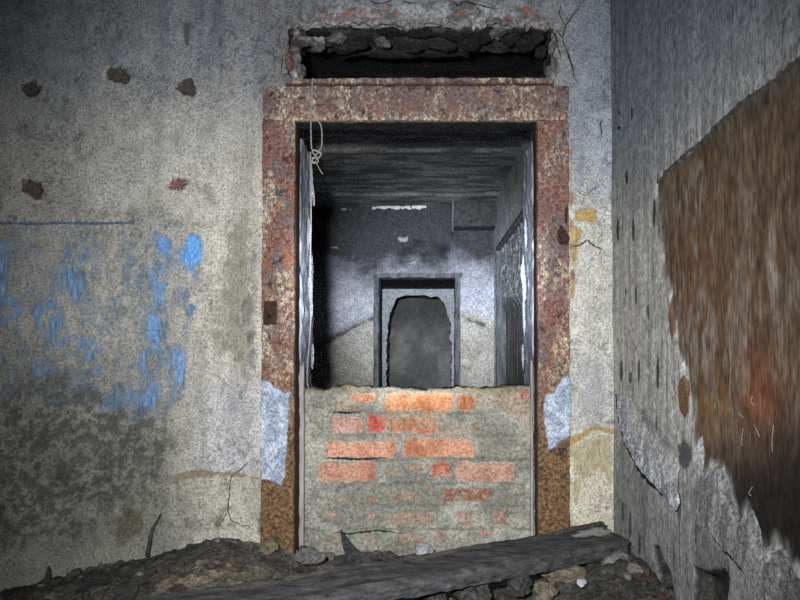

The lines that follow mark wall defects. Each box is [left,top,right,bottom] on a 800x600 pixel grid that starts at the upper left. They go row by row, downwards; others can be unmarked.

crack [550,1,582,84]
spalling [100,65,131,87]
spalling [15,177,50,204]
peeling [58,244,88,301]
peeling [0,221,202,271]
peeling [107,257,186,409]
peeling [182,290,196,316]
flaking render [653,57,800,600]
rust [678,376,690,418]
flaking render [615,393,680,518]
crack [222,459,253,530]